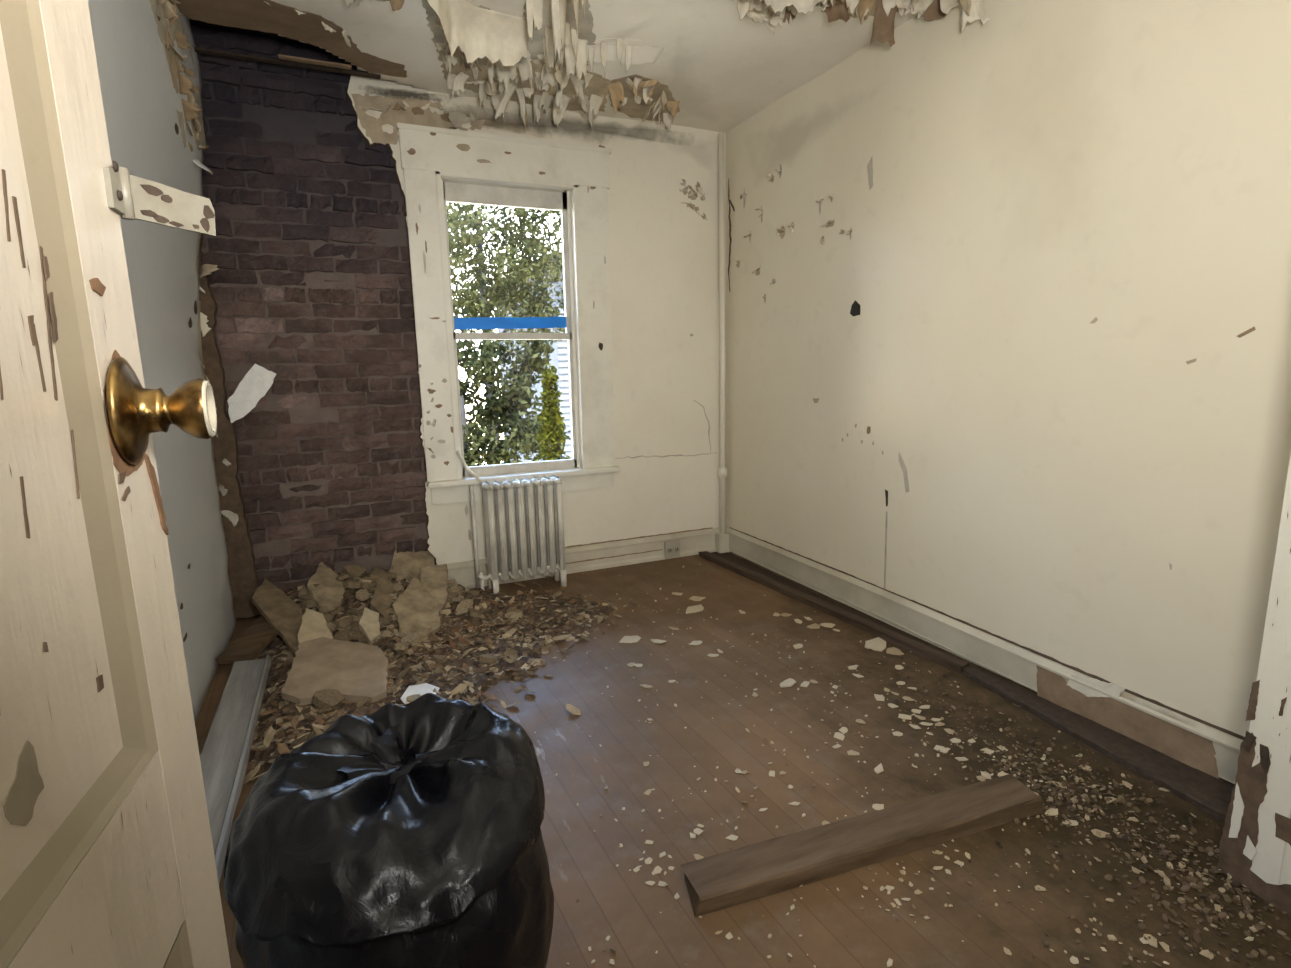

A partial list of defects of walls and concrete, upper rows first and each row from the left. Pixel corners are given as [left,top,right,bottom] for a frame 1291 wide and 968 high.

peeling [732,0,989,47]
flaking render [140,0,680,618]
peeling [1036,665,1219,779]
peeling [1216,680,1291,917]